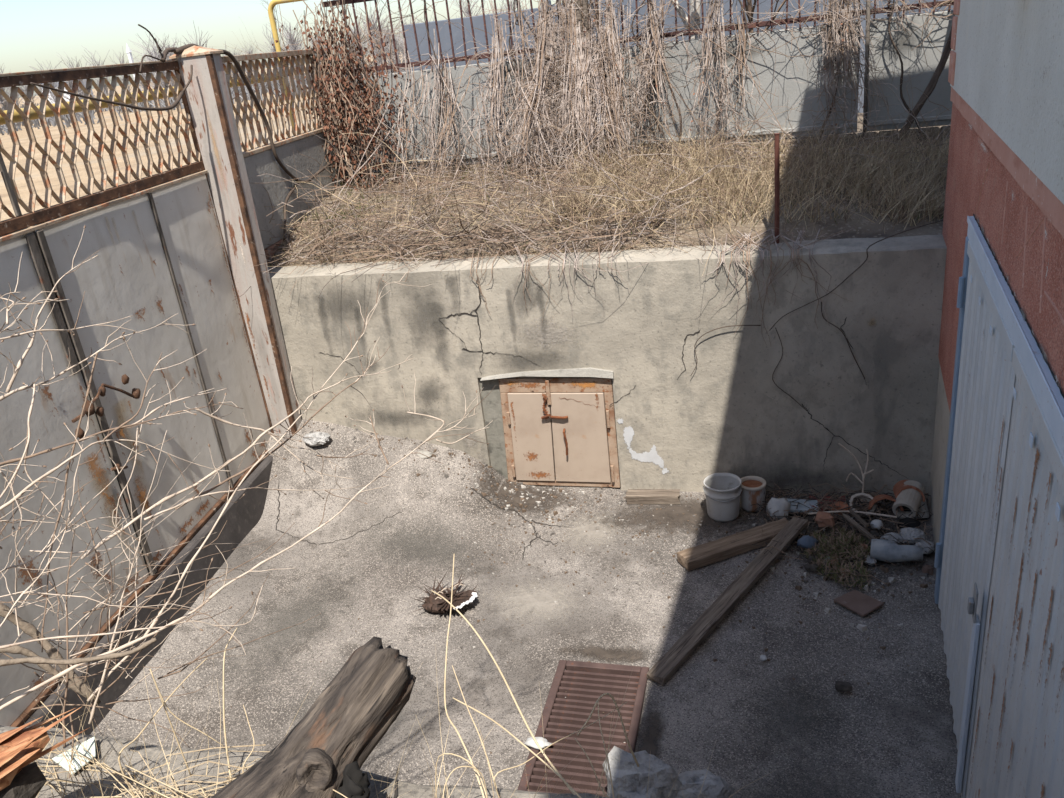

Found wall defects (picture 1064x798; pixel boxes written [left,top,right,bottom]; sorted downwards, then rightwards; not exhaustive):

crack [439,277,541,375]
corrosion [87,437,134,546]
corrosion [135,480,161,561]
corrosion [526,452,550,479]
peeling [617,419,669,474]
corrosion [1007,449,1052,680]
corrosion [1037,589,1064,705]